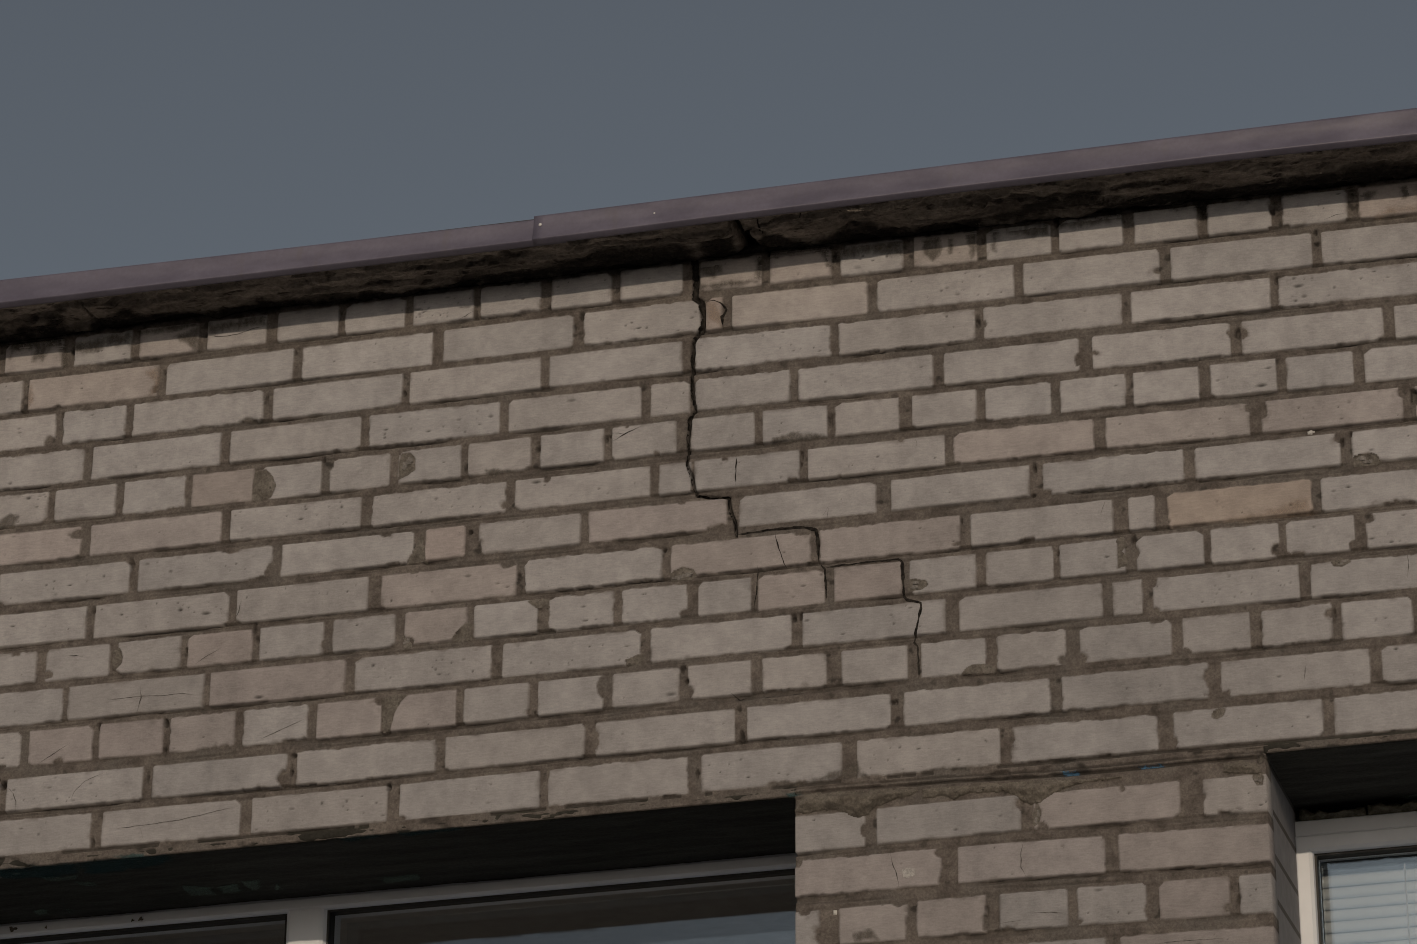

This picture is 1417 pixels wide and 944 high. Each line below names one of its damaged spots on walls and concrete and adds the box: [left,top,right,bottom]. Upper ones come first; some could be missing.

leakage [0,165,1417,366]
crack [685,260,922,675]